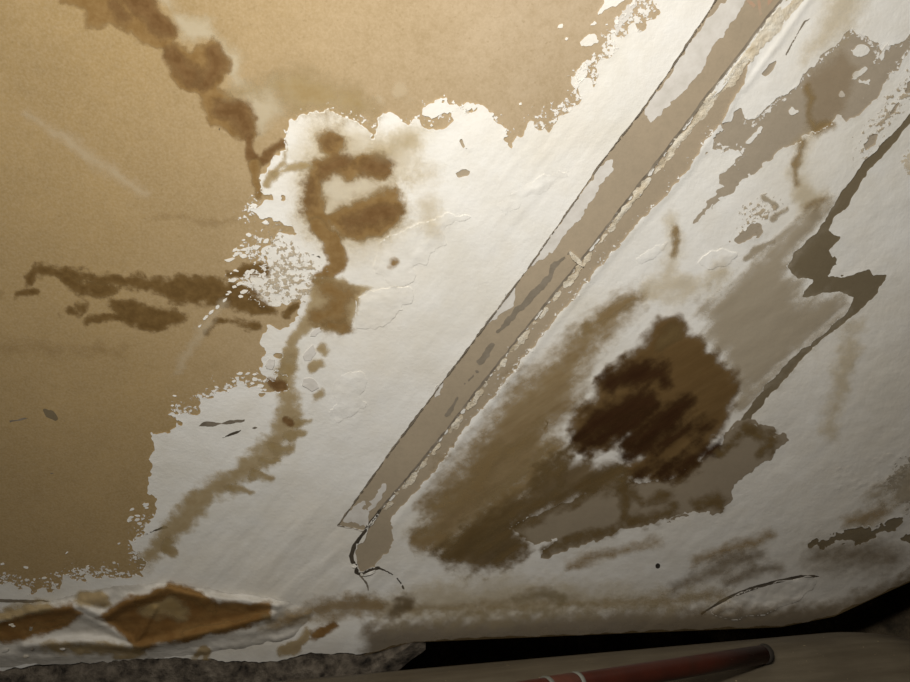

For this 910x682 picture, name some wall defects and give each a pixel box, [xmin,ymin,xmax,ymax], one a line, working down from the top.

water stain [15,0,404,564]
peeling [0,0,660,596]
crack [337,0,782,595]
water stain [410,296,776,571]
peeling [339,0,910,571]
crack [786,19,809,55]